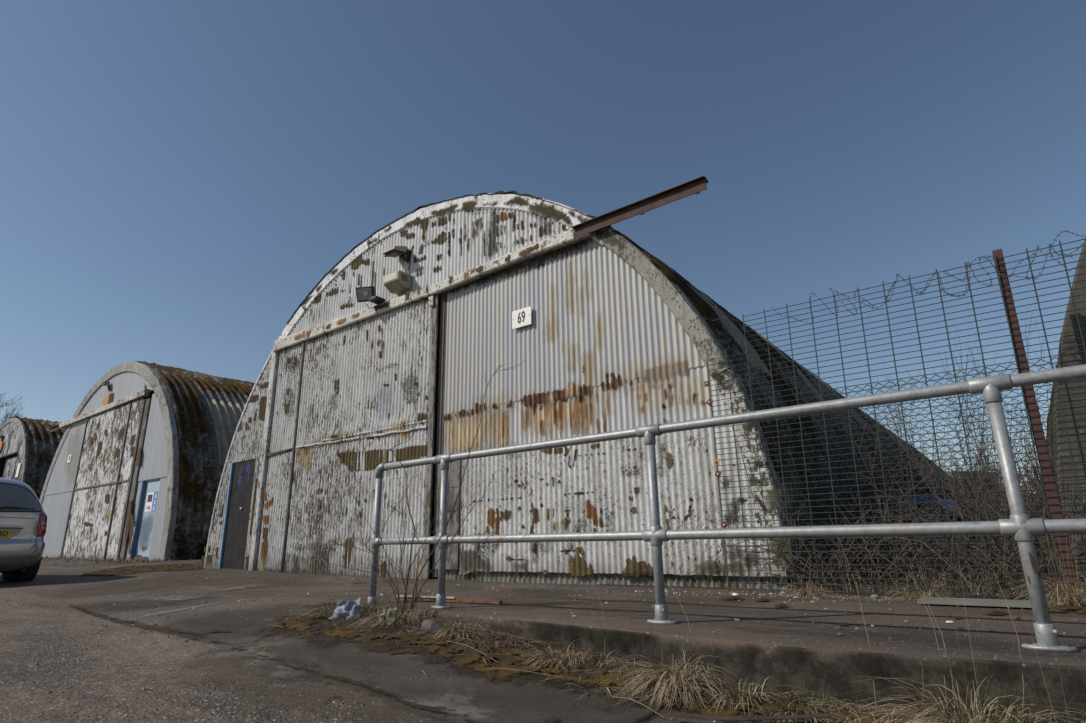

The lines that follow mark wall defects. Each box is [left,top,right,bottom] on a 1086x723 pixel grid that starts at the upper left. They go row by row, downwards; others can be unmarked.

peeling [400,214,482,278]
peeling [495,212,567,253]
peeling [314,255,385,310]
peeling [357,324,428,404]
peeling [245,382,269,430]
peeling [283,388,295,417]
corrosion [444,346,704,453]
peeling [90,423,140,459]
peeling [337,445,428,472]
peeling [344,537,352,568]